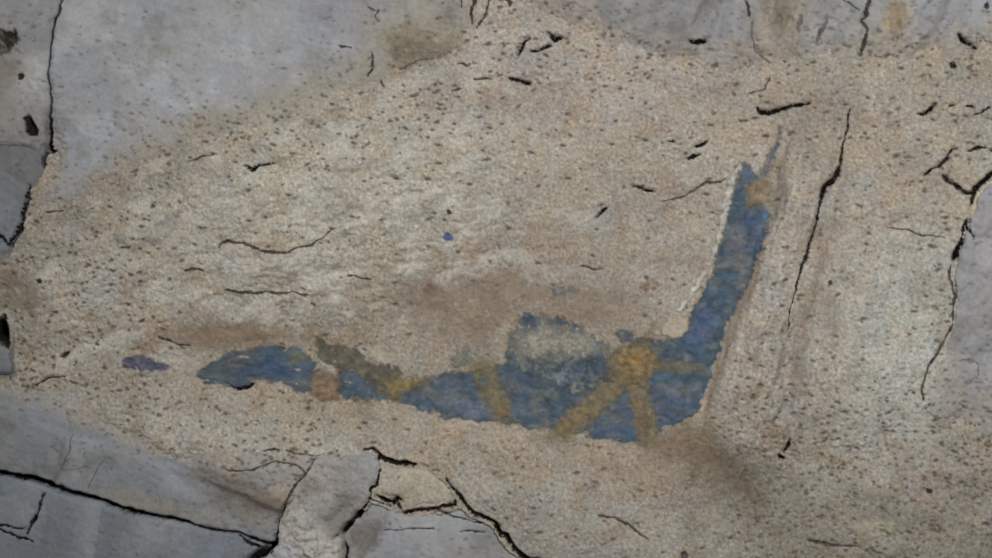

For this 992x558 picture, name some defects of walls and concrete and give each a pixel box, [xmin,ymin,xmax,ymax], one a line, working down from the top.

crack [0,108,64,246]
spalling [148,213,177,246]
spalling [238,257,282,277]
crack [787,108,851,331]
crack [887,146,992,401]
peeling [337,368,392,401]
spalling [365,347,391,365]
crack [0,433,106,542]
crack [225,448,323,558]
spalling [379,457,452,507]
crack [334,447,531,558]
spalling [848,515,896,539]